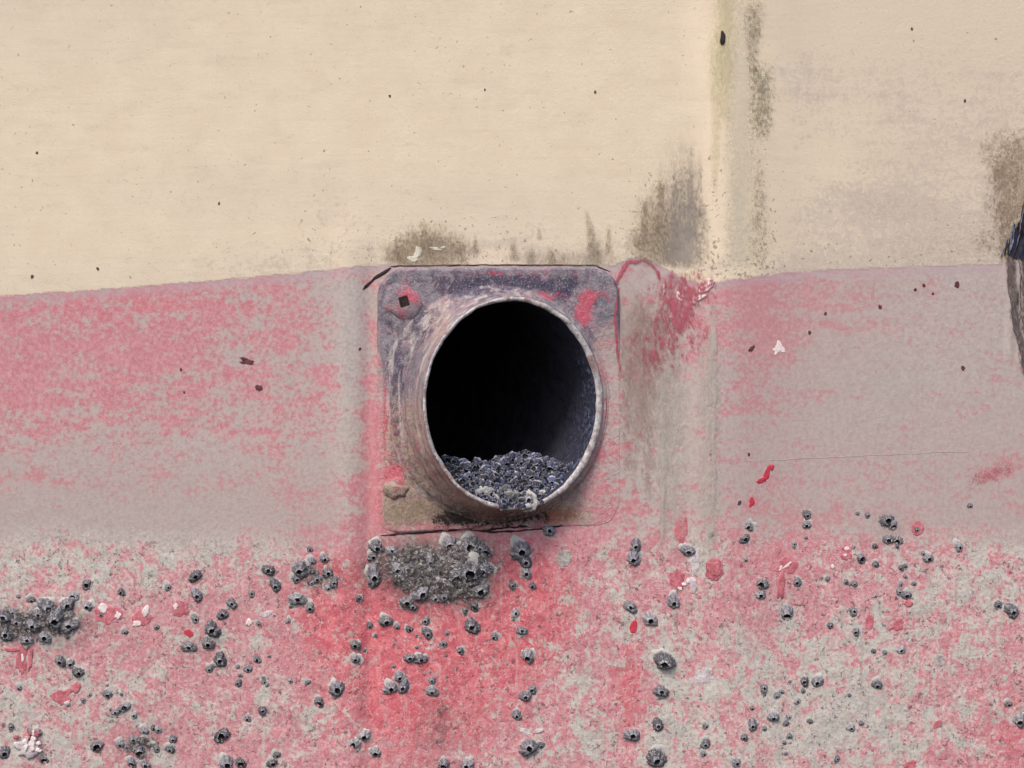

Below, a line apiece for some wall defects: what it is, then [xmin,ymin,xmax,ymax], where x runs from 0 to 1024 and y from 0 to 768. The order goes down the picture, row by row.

mould [744,3,774,141]
water stain [634,180,701,264]
water stain [386,232,476,265]
peeling [613,258,715,372]
peeling [674,515,688,544]
peeling [668,547,724,594]
peeling [772,556,799,599]
peeling [94,603,152,627]
peeling [172,600,189,617]
peeling [4,645,33,675]
peeling [51,682,81,706]
peeling [13,729,43,760]